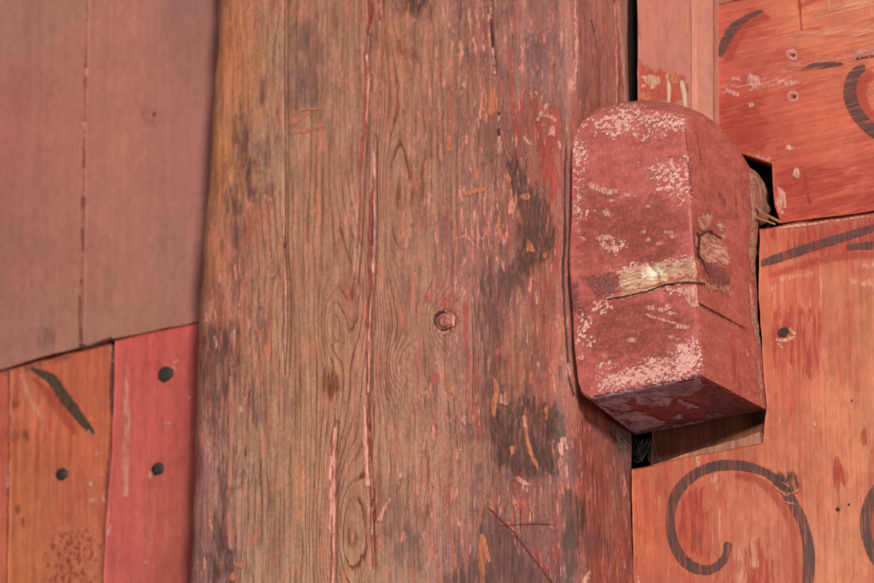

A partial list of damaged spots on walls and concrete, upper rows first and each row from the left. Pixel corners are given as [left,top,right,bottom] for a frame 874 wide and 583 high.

peeling [537,60,695,241]
peeling [571,212,750,433]